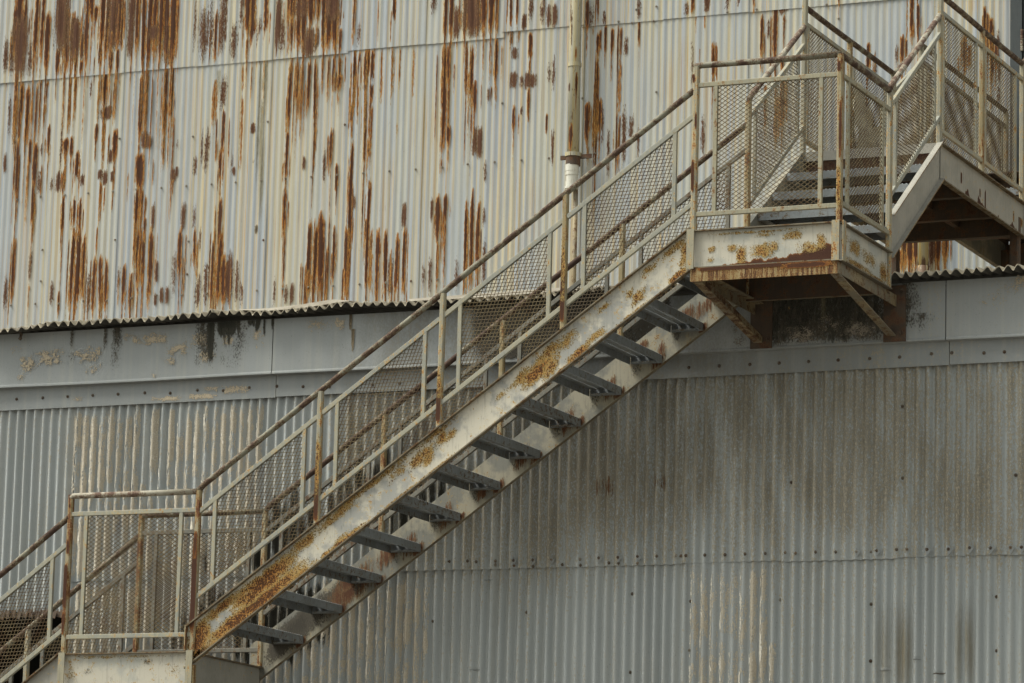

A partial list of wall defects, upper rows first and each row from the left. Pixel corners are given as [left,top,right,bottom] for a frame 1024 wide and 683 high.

rust [430,0,641,207]
rust [683,0,711,28]
rust [895,0,920,96]
rust [982,6,1001,108]
rust [3,0,415,323]
rust [421,188,486,295]
rust [900,241,952,273]
water stain [103,328,122,361]
water stain [196,319,274,359]
rust [496,228,887,400]
water stain [772,295,884,344]
rust [66,365,457,682]